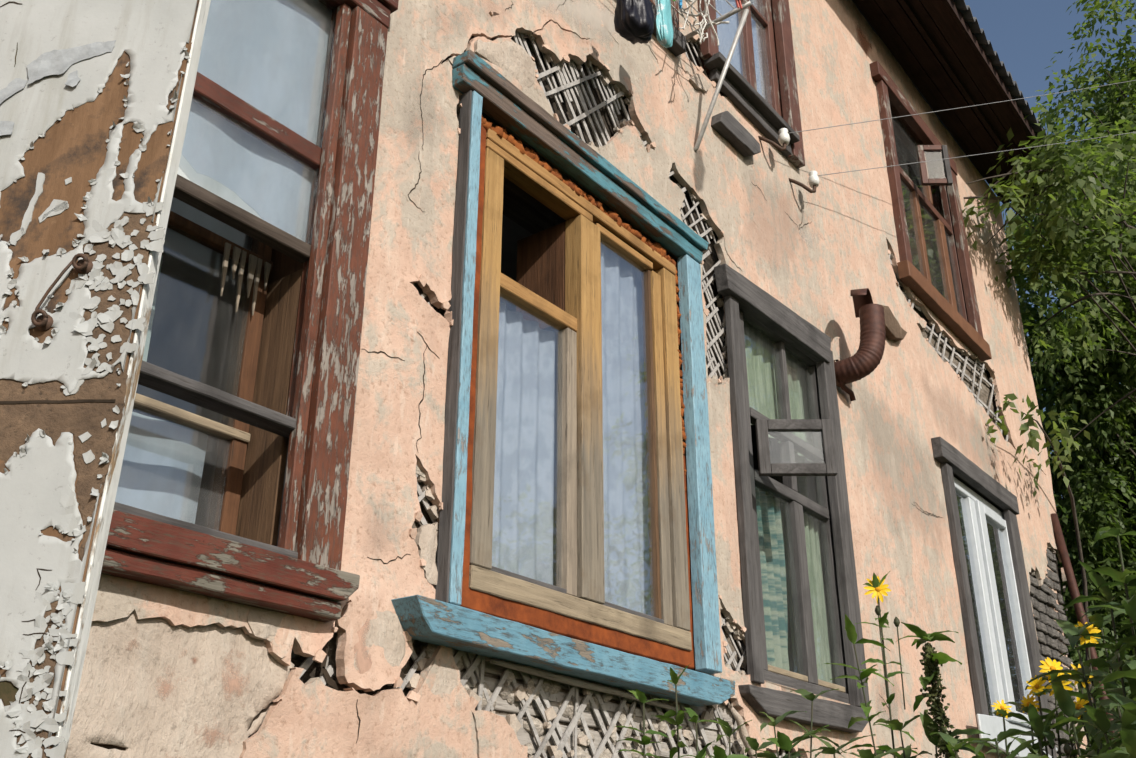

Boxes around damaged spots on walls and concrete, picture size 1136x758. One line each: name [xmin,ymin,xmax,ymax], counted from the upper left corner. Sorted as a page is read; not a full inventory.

crack [408,36,497,212]
peeling [474,31,656,152]
peeling [0,40,192,561]
crack [365,333,440,451]
spalling [668,171,729,383]
spalling [887,249,1008,442]
peeling [409,464,443,588]
spalling [0,582,335,758]
crack [247,701,274,731]
crack [321,641,405,743]
spalling [387,631,749,758]
flaking render [1029,546,1078,758]